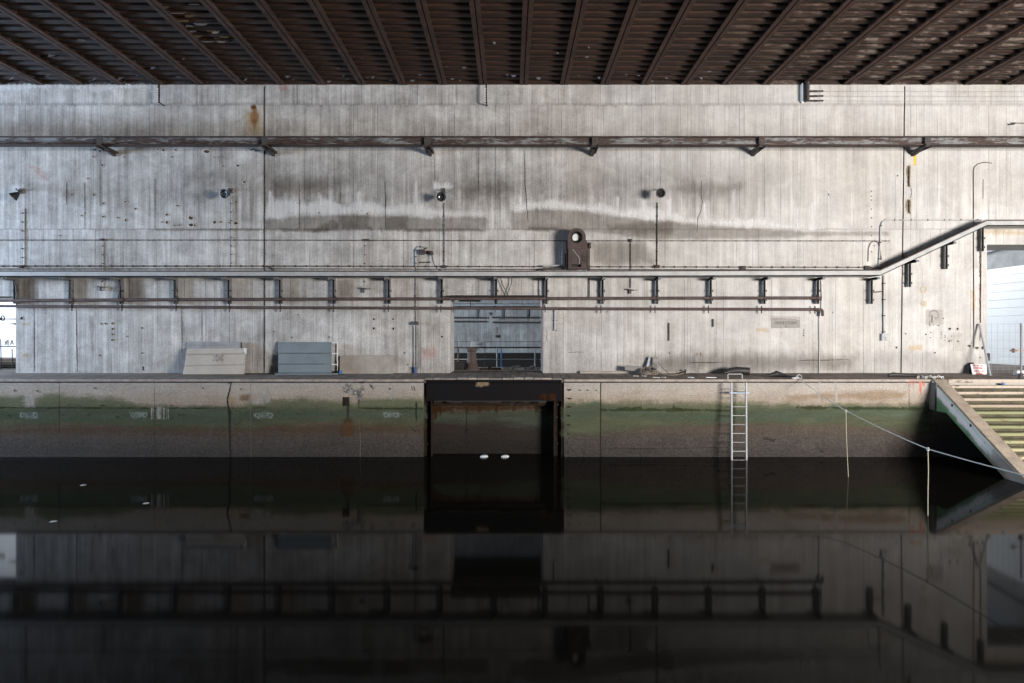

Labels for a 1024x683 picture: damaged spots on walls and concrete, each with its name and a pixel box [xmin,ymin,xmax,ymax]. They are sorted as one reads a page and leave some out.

crack [225,382,233,457]